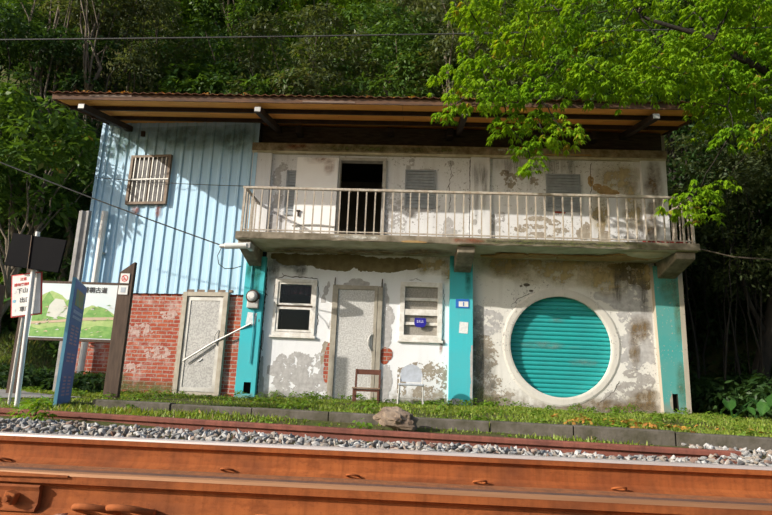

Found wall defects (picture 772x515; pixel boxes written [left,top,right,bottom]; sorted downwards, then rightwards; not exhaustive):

peeling [269,162,288,232]
peeling [491,212,505,231]
peeling [514,207,609,241]
water stain [592,207,608,224]
water stain [603,168,661,239]
flaking render [271,253,422,286]
efflorescence [160,310,178,320]
water stain [122,323,171,379]
peeling [258,320,330,396]
peeling [380,283,515,405]
water stain [473,323,498,404]
water stain [568,391,655,412]